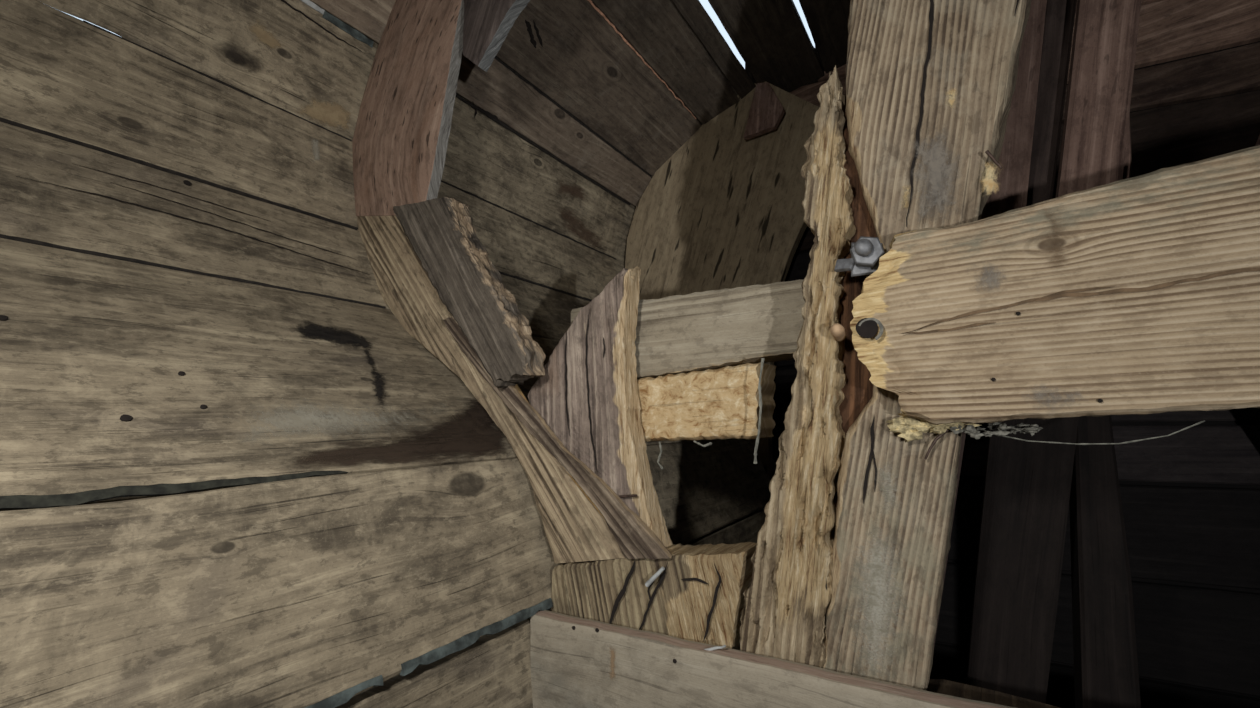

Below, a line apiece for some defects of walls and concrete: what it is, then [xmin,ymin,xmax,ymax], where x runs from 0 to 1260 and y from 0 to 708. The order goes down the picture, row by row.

crack [906,0,934,227]
water stain [267,321,505,466]
crack [609,560,721,642]